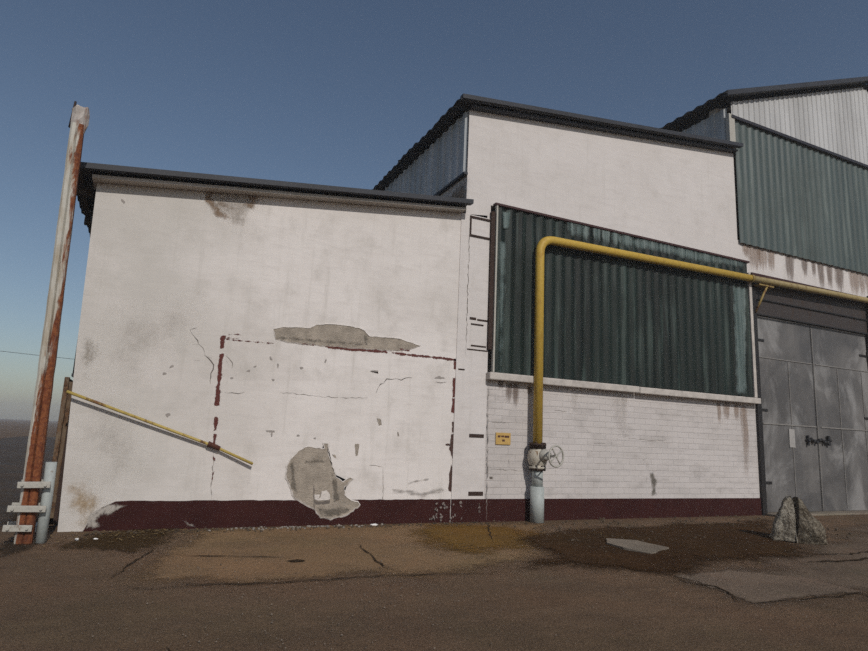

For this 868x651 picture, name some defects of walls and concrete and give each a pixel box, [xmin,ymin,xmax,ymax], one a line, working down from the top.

crack [190,328,233,380]
flaking render [273,323,421,352]
flaking render [285,437,360,520]